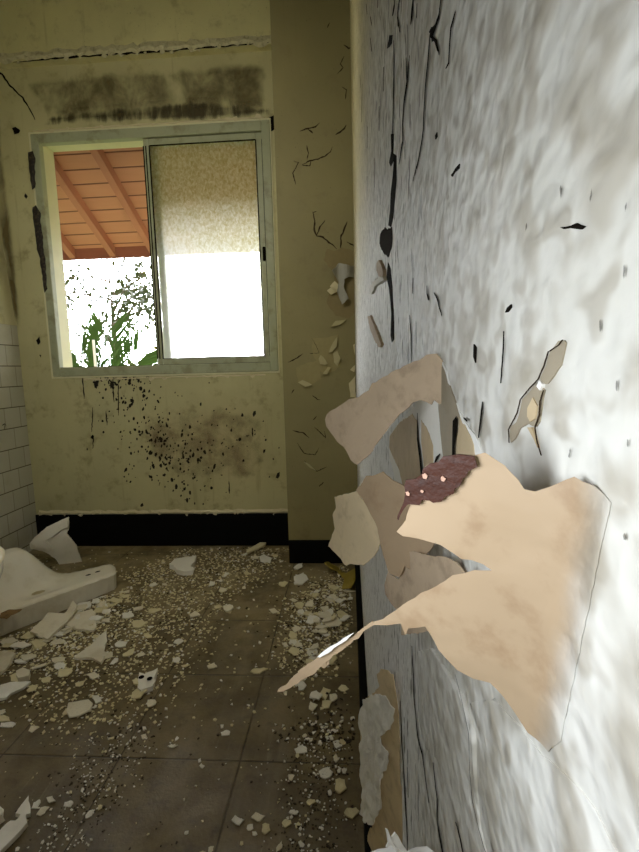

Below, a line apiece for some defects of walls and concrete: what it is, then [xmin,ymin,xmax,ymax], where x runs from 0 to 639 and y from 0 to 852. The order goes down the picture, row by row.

crack [0,72,35,119]
crack [19,42,268,62]
water stain [51,68,262,123]
crack [388,0,456,227]
crack [313,211,354,249]
peeling [296,247,355,387]
peeling [368,315,384,347]
crack [386,263,442,361]
water stain [82,376,267,505]
peeling [277,340,611,752]
peeling [358,669,434,852]
crack [400,655,463,852]